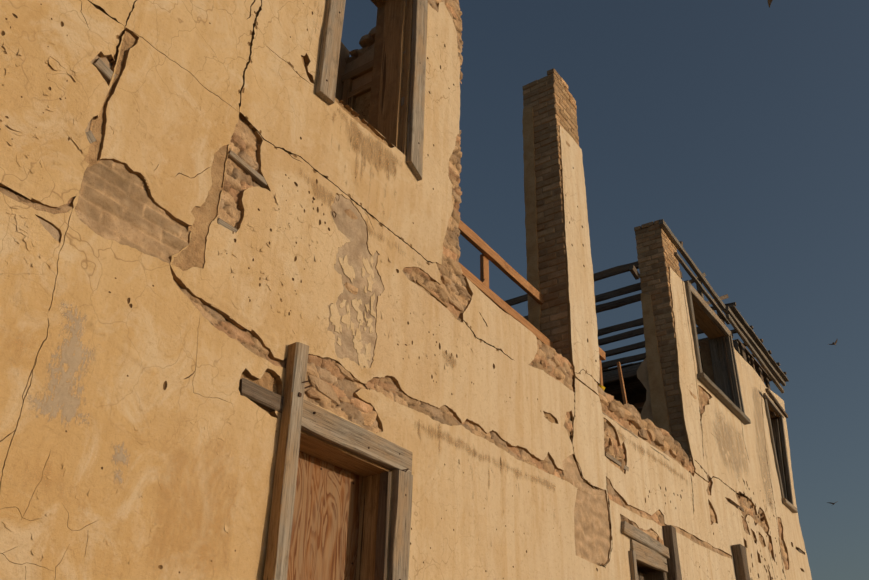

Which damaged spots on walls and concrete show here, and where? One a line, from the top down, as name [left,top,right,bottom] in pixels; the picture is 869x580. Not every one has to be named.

spalling [428,0,463,89]
spalling [0,31,267,271]
crack [81,0,434,265]
spalling [396,130,471,322]
crack [0,208,73,487]
spalling [174,281,287,394]
crack [461,312,515,361]
peeling [282,174,731,572]
crack [689,407,748,513]
crack [1,546,63,580]
spalling [726,479,788,580]